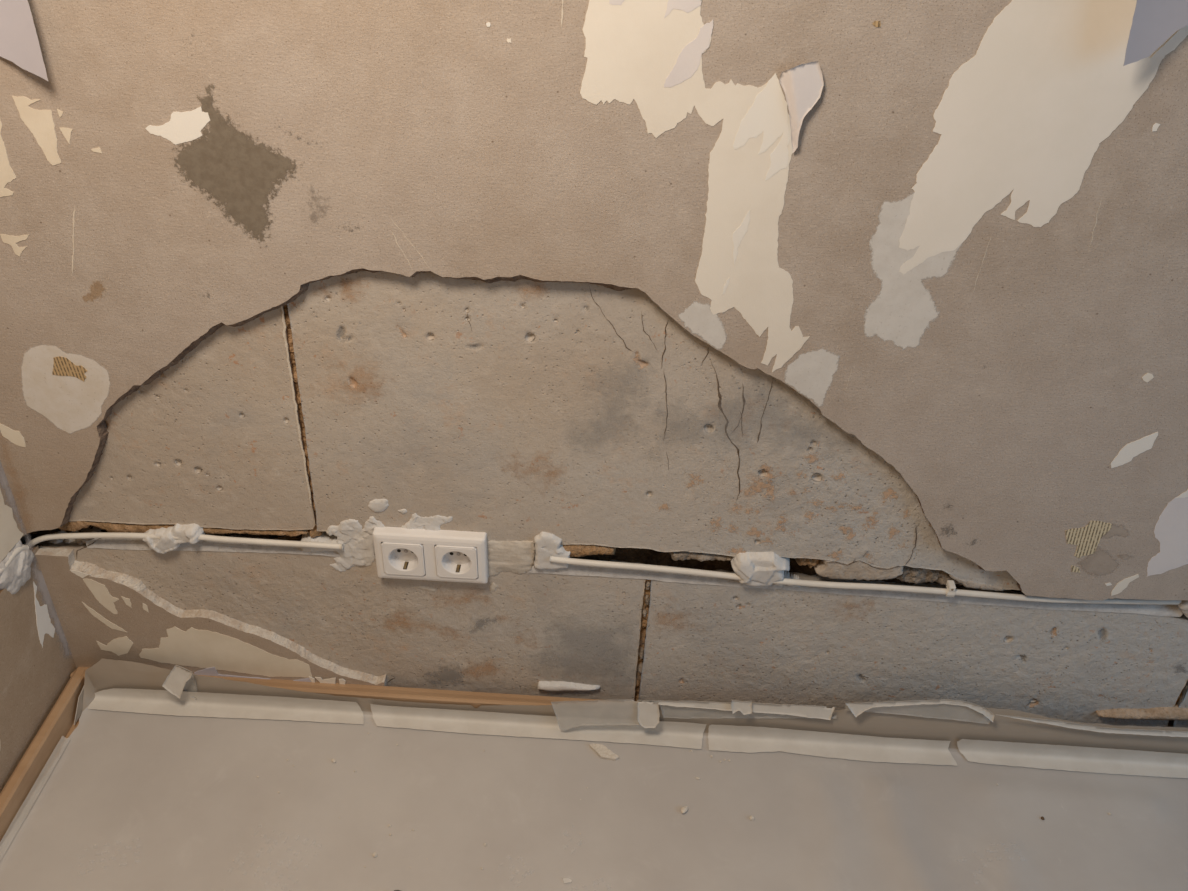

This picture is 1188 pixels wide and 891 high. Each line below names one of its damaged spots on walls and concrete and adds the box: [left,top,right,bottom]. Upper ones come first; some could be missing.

water stain [174,85,296,241]
spalling [38,268,1188,728]
crack [589,287,669,470]
crack [702,352,773,501]
crack [827,528,917,570]